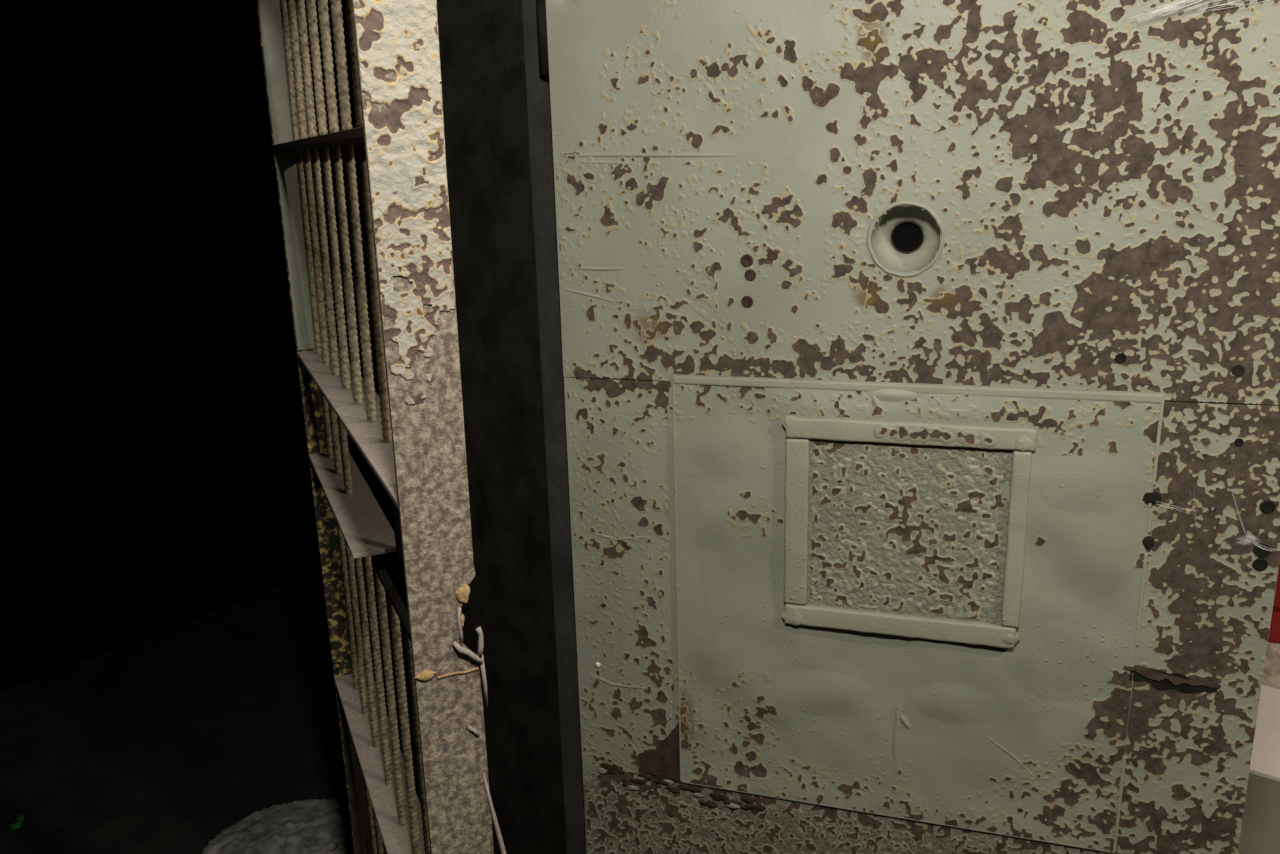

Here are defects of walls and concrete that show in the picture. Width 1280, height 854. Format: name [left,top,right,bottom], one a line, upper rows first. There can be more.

peeling [354,0,455,404]
peeling [556,0,1280,428]
peeling [912,253,1134,459]
peeling [571,475,682,673]
peeling [726,490,784,538]
peeling [811,442,1007,621]
peeling [1033,535,1048,547]
peeling [585,780,732,854]
peeling [751,752,1003,854]
peeling [1090,642,1280,854]